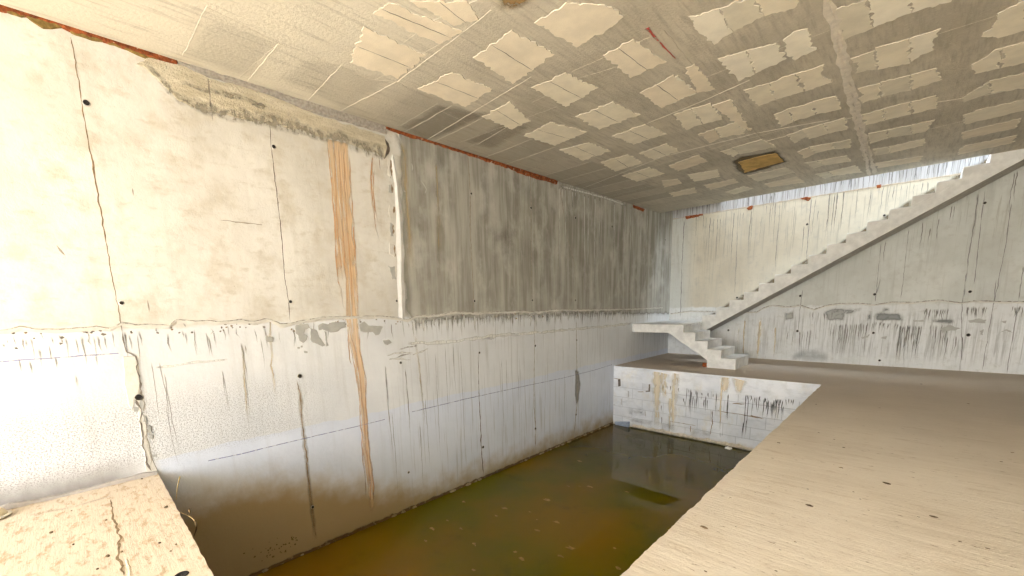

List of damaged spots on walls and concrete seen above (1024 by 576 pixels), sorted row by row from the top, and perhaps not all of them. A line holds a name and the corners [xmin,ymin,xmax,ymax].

spalling [0,4,558,279]
corrosion [328,139,374,497]
water stain [391,134,673,339]
water stain [656,374,794,433]
water stain [830,310,963,352]
crack [110,499,132,576]